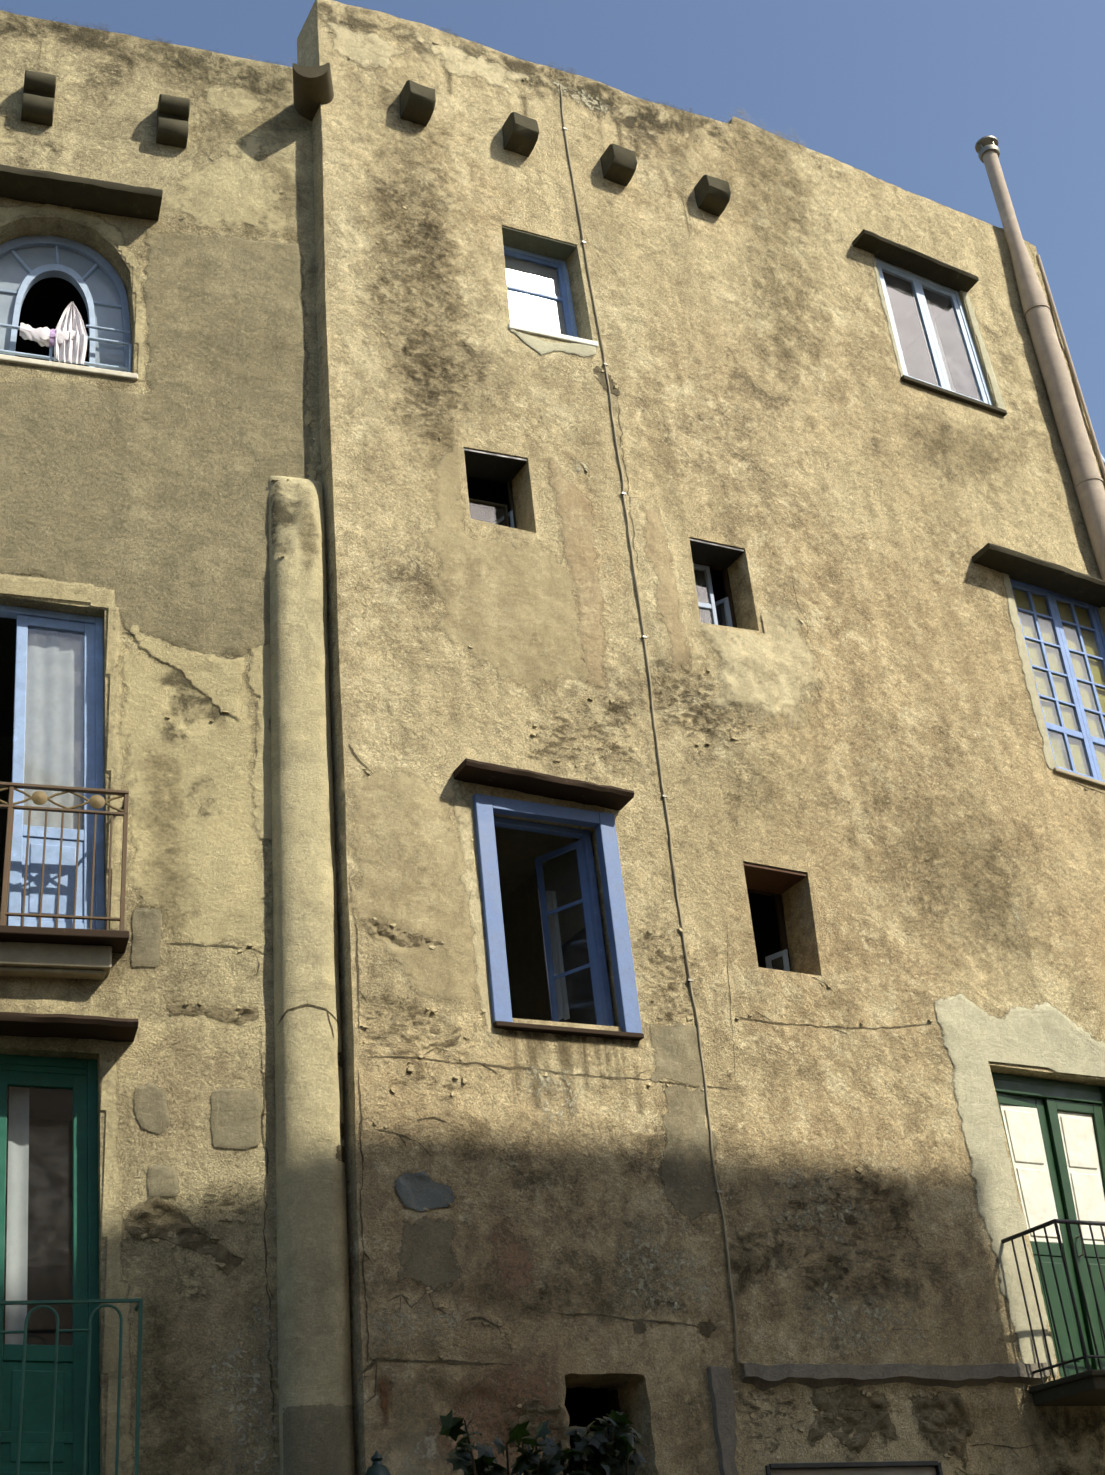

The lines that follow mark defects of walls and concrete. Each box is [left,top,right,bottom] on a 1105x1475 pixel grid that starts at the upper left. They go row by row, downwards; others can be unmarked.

damp [367,90,469,403]
spalling [271,478,299,559]
peeling [130,625,245,739]
crack [166,942,267,977]
crack [256,878,932,1459]
spalling [125,1184,261,1275]
damp [730,1169,909,1292]
spalling [747,1383,898,1460]
spalling [909,1391,978,1475]